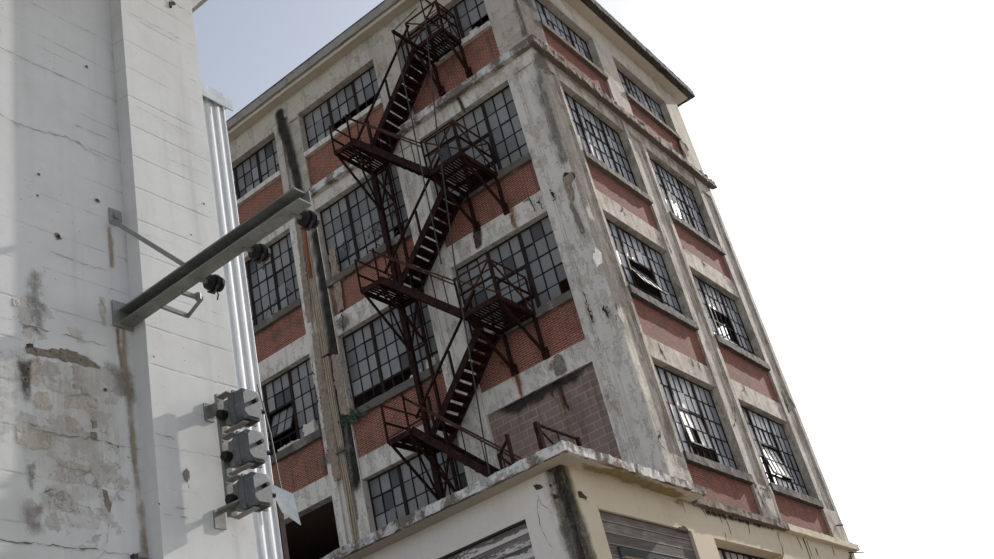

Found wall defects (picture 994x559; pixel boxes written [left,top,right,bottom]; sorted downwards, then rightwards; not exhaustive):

peeling [22,343,108,440]
corrosion [116,328,131,410]
spalling [550,354,566,376]
corrosion [130,422,139,486]
crack [0,524,130,558]
peeling [44,489,112,529]
leakage [546,464,597,559]